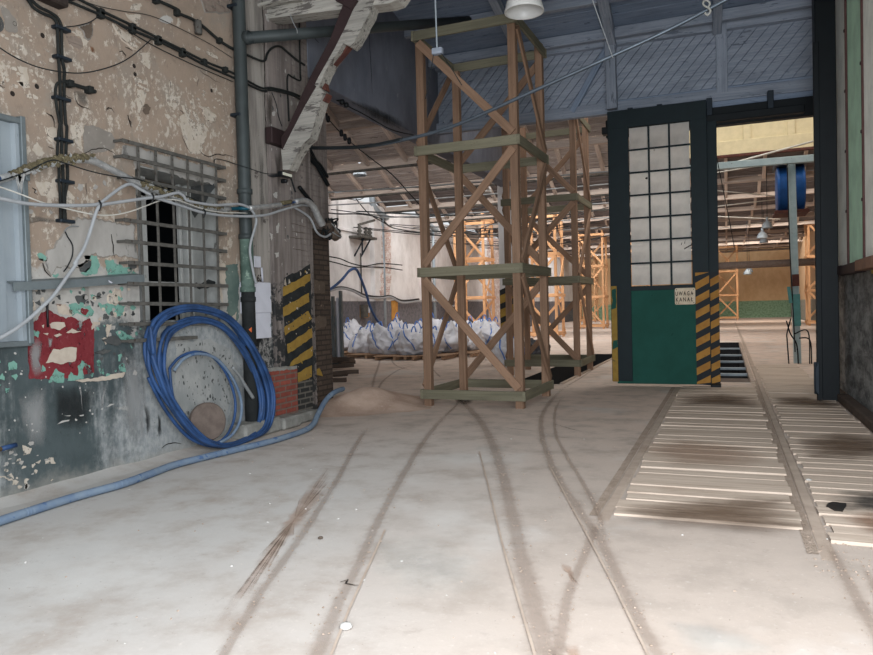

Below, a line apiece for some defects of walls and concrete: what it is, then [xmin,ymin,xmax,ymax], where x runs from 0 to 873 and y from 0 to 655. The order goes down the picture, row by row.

peeling [0,17,55,99]
spalling [112,0,230,194]
spalling [29,176,139,278]
damp [32,340,51,368]
peeling [32,287,141,393]
peeling [0,423,55,490]
damp [26,397,43,437]
damp [58,389,86,422]